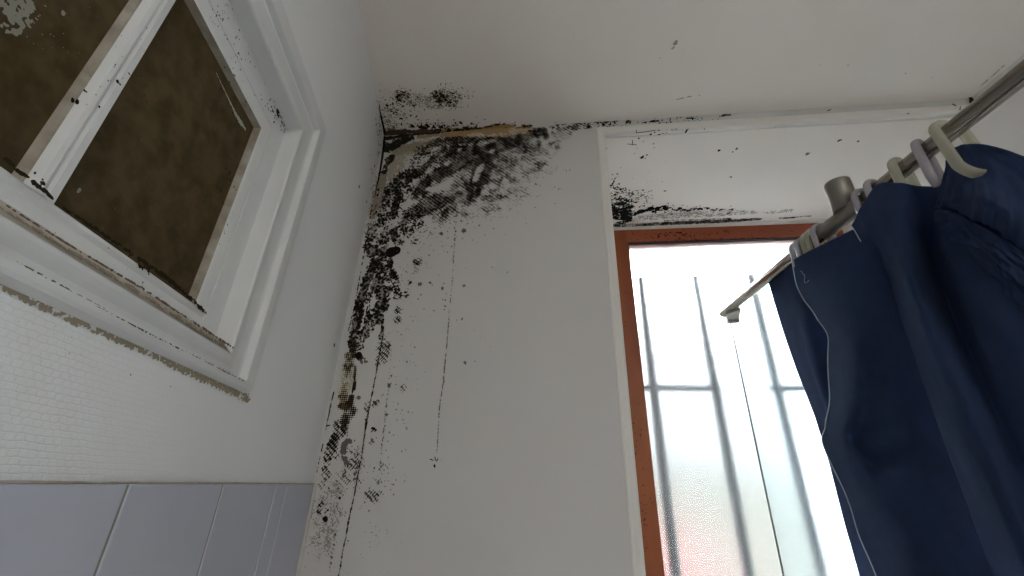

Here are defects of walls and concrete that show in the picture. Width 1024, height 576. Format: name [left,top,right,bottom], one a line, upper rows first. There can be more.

damp [308,83,731,576]
mould [610,167,794,243]